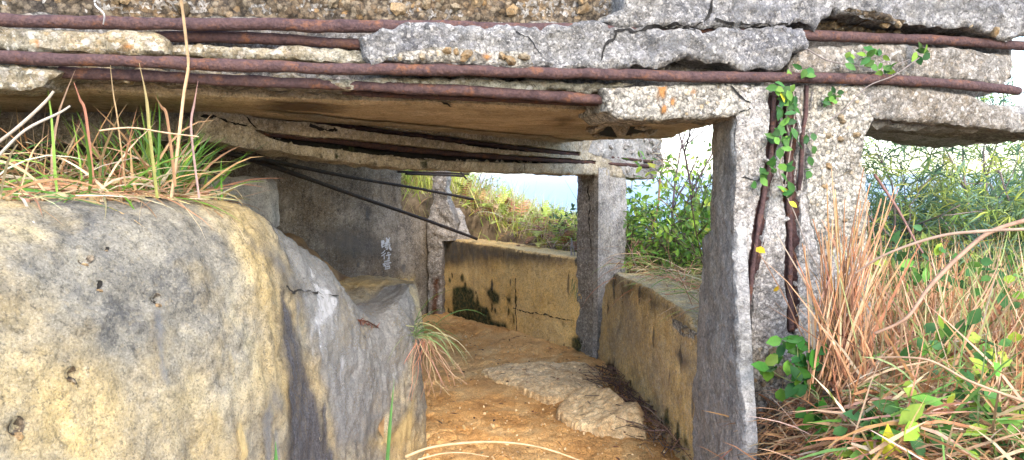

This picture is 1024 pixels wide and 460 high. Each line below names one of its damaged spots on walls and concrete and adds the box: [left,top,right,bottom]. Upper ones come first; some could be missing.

crack [601,0,788,60]
spalling [816,8,905,34]
spalling [370,46,533,68]
corrosion [658,86,675,113]
leakage [444,241,561,328]
crack [513,278,568,330]